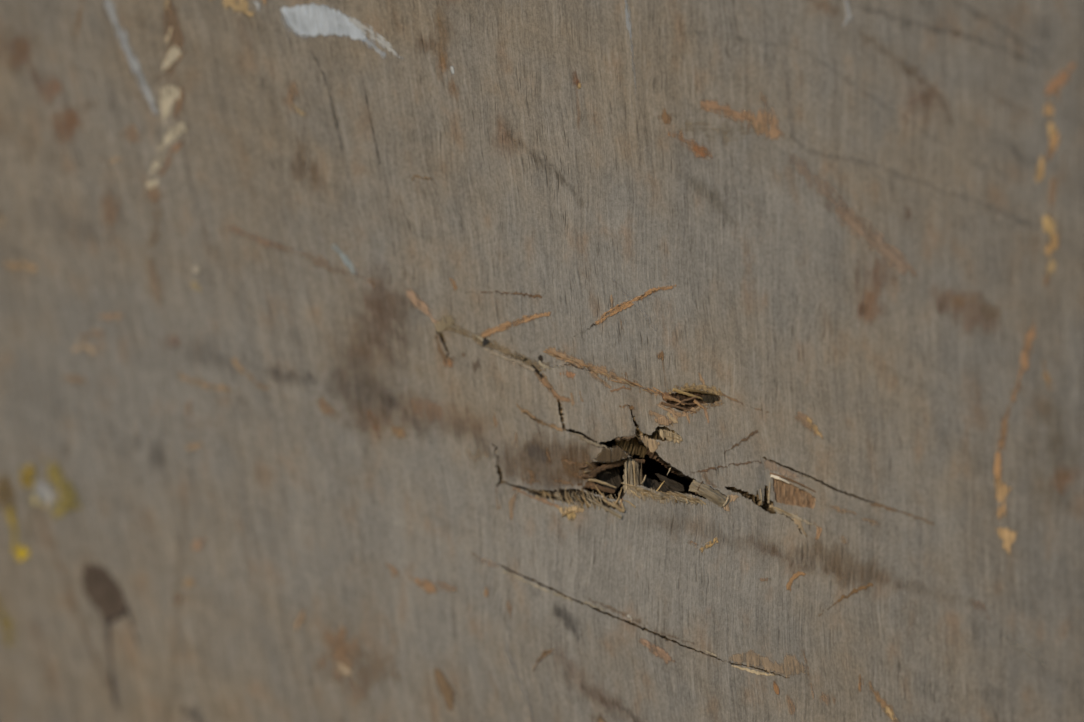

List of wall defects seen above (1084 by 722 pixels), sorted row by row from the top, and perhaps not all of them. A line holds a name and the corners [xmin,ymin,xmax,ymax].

peeling [145,0,188,192]
peeling [1035,63,1076,285]
crack [434,315,583,431]
crack [493,417,571,519]
crack [628,405,643,436]
crack [725,457,902,539]
peeling [994,323,1036,554]
crack [481,559,790,678]